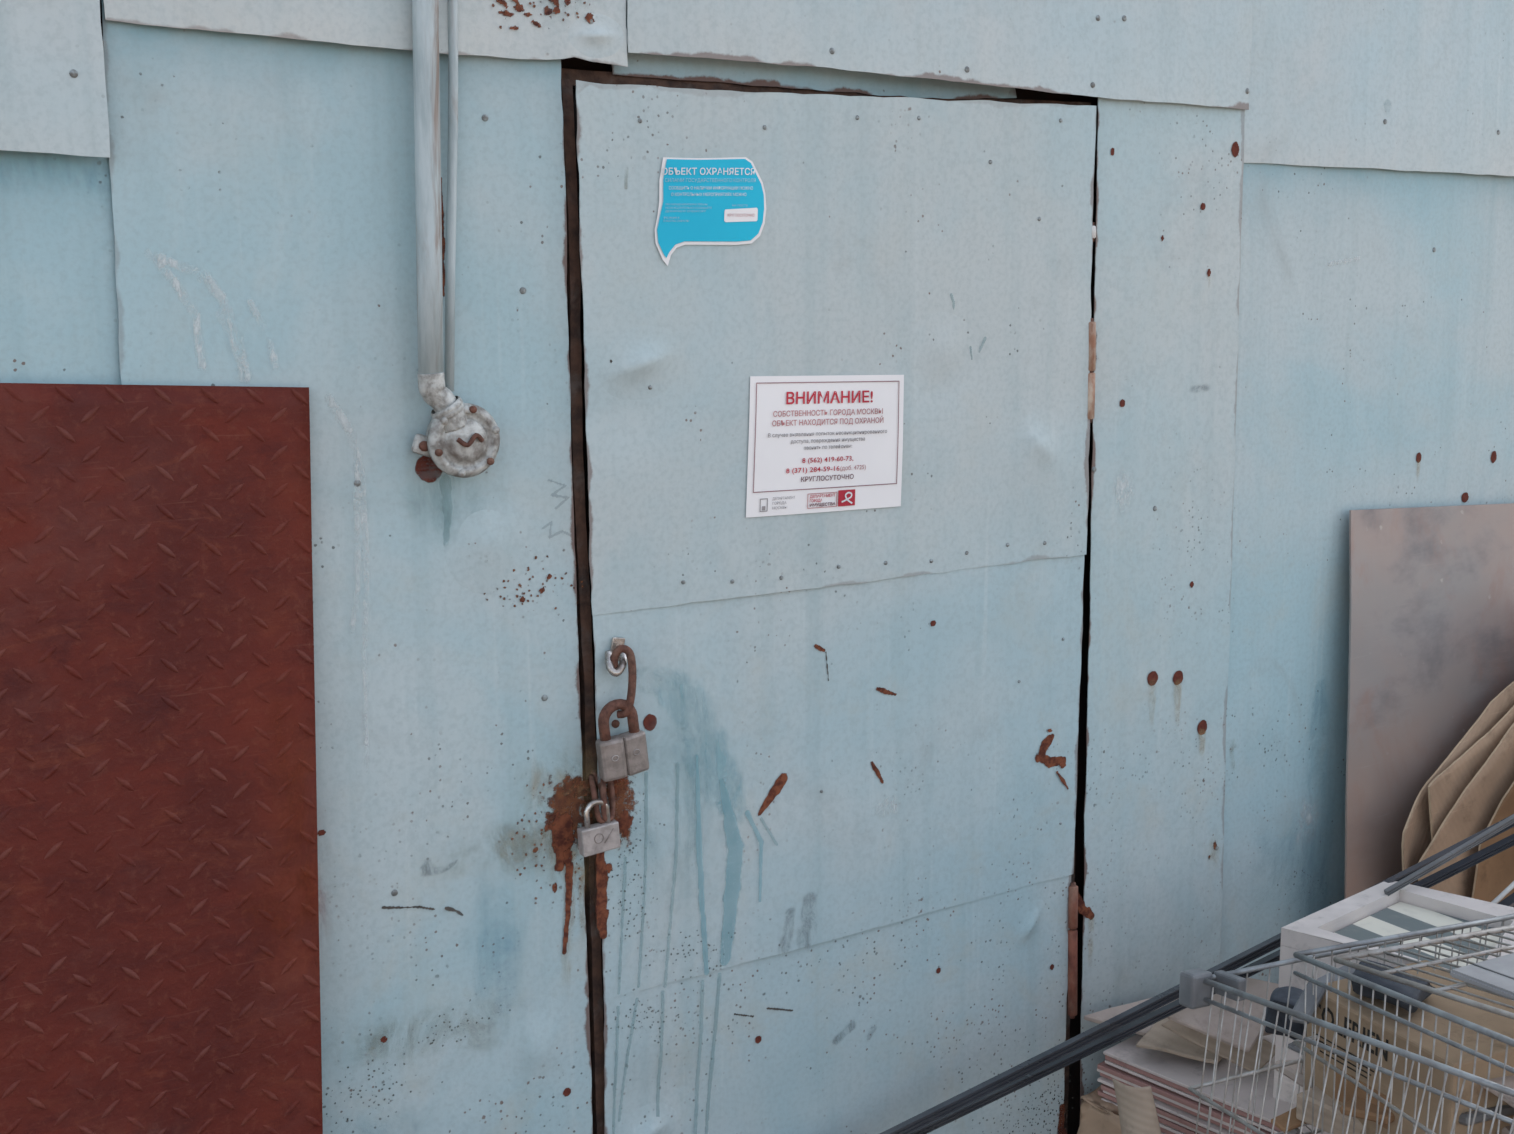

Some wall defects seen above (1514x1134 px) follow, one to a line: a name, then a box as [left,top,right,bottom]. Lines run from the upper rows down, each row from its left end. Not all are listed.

corrosion [492,0,595,30]
corrosion [1147,671,1183,686]
corrosion [1197,720,1207,735]
corrosion [1035,729,1069,789]
corrosion [504,775,644,954]
leakage [608,872,736,991]